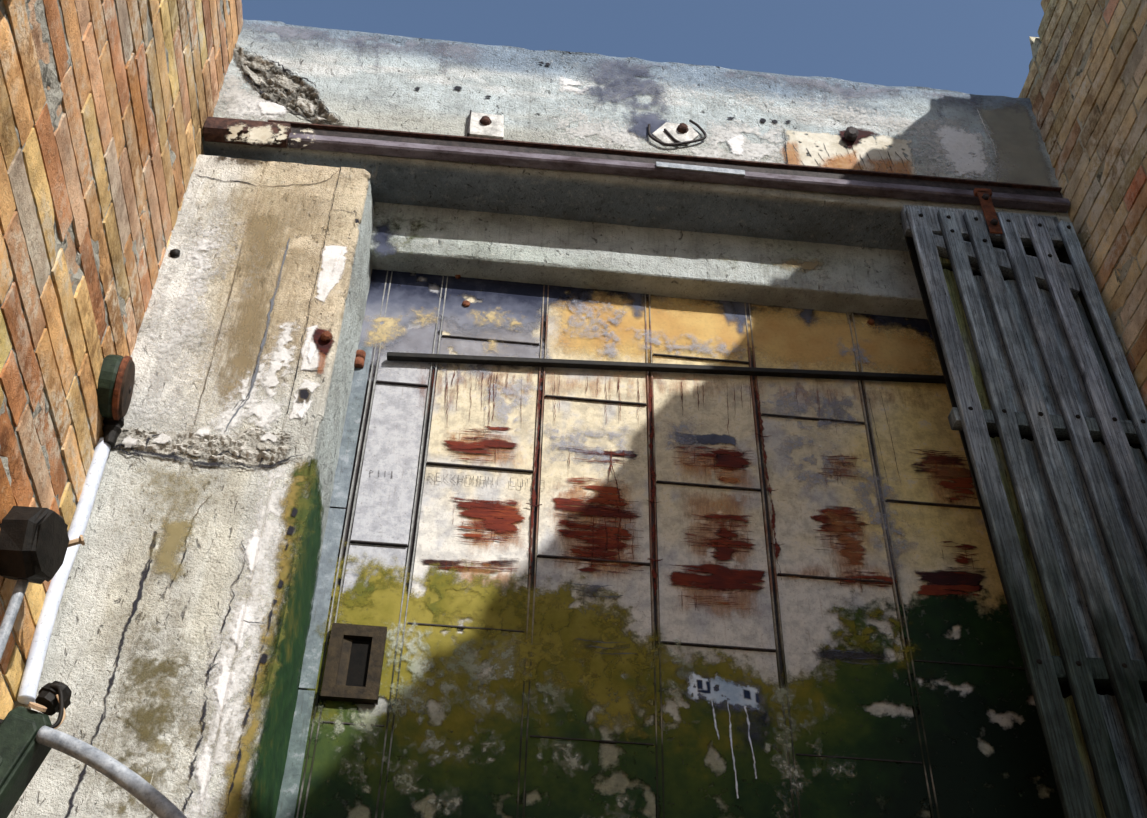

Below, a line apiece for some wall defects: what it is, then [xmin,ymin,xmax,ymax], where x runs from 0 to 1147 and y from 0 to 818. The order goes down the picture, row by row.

spalling [227,44,344,146]
leakage [557,60,673,151]
leakage [726,72,1003,178]
crack [113,238,306,469]
peeling [289,325,320,419]
corrosion [313,328,334,373]
spalling [111,427,292,466]
corrosion [421,370,784,613]
corrosion [804,506,897,587]
crack [65,495,212,818]
leakage [122,461,291,818]
crack [183,542,246,809]